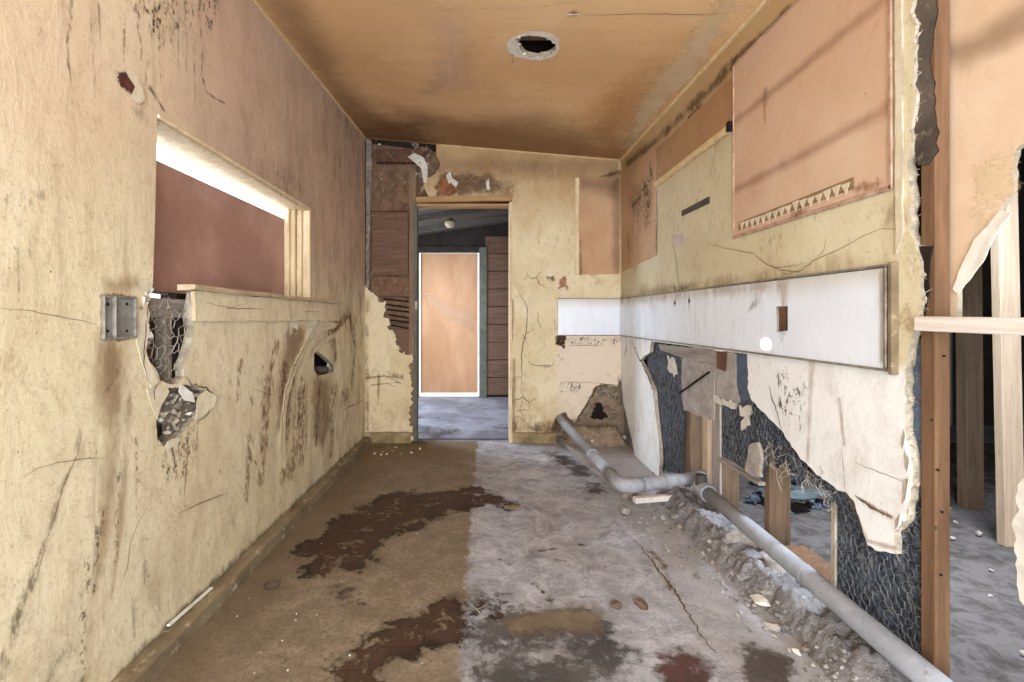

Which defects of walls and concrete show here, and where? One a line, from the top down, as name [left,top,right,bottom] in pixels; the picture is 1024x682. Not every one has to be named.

mould [133,0,218,48]
spalling [512,40,555,56]
flaking render [548,0,932,312]
flaking render [366,139,493,355]
crack [705,228,884,275]
flaking render [133,279,216,449]
damp [246,342,307,484]
crack [513,272,656,427]
flaking render [552,379,634,451]
crack [18,432,95,598]
damp [289,486,521,579]
crack [633,539,716,653]